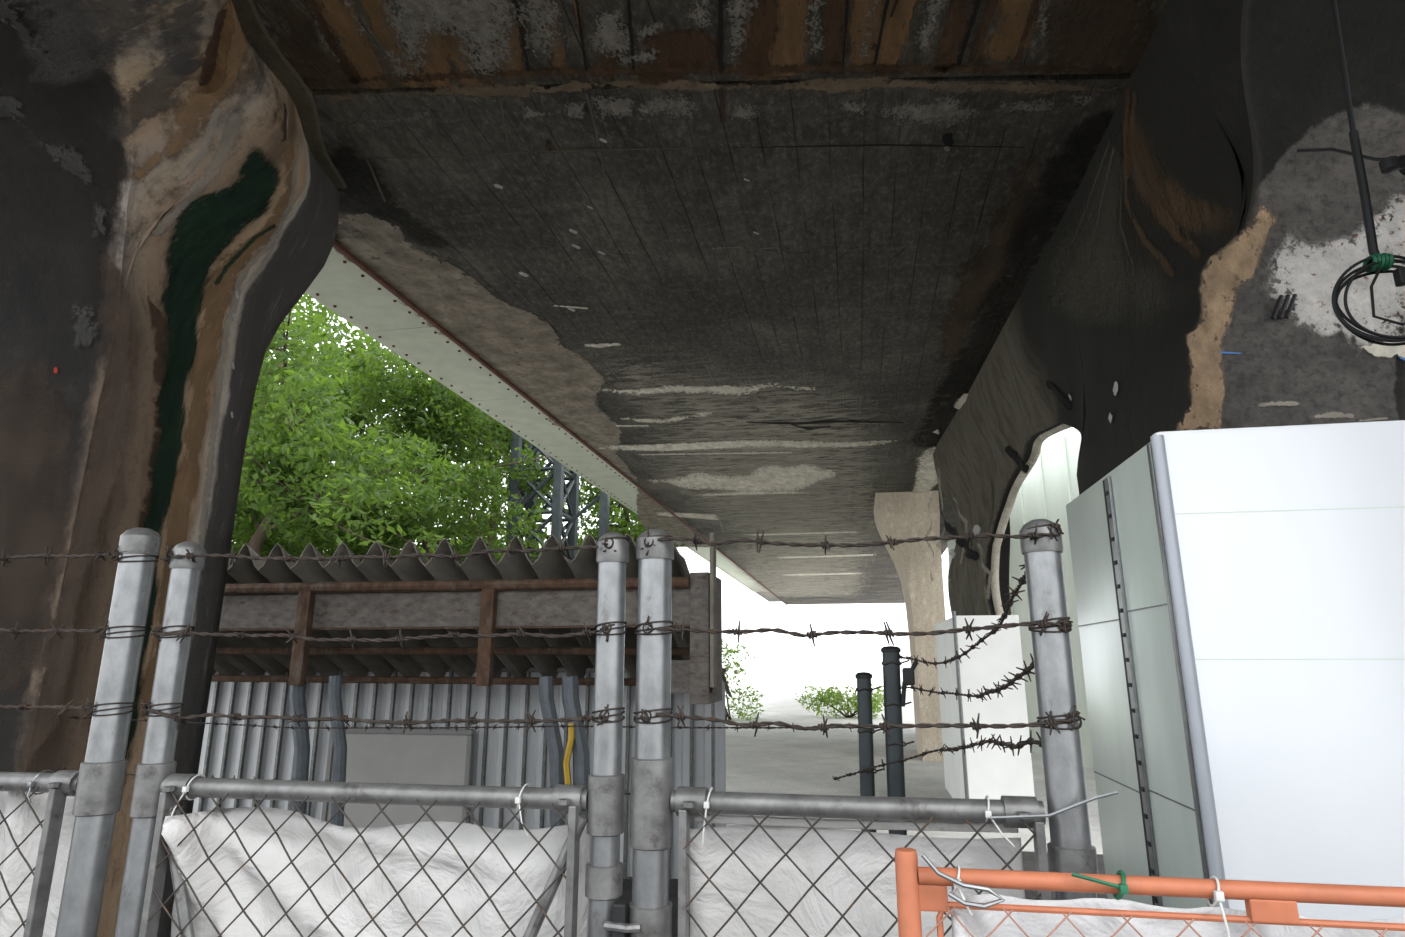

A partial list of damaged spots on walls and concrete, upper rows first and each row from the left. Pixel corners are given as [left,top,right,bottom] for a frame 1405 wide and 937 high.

damp [381,0,664,79]
rust [304,0,1130,123]
damp [682,0,760,69]
damp [802,0,827,57]
damp [911,0,950,52]
damp [139,107,302,545]
peeling [334,213,718,547]
damp [595,92,1112,600]
spalling [1178,196,1405,431]
damp [125,562,158,760]